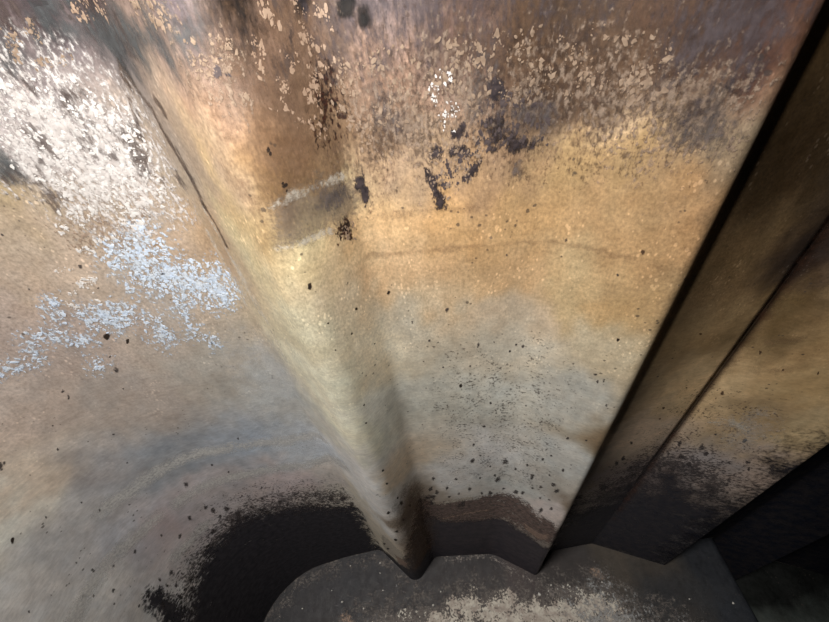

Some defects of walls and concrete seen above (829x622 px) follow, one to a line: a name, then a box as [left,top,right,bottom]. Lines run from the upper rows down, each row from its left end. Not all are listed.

peeling [129,0,254,126]
peeling [355,170,373,207]
peeling [424,52,552,210]
peeling [577,53,782,171]